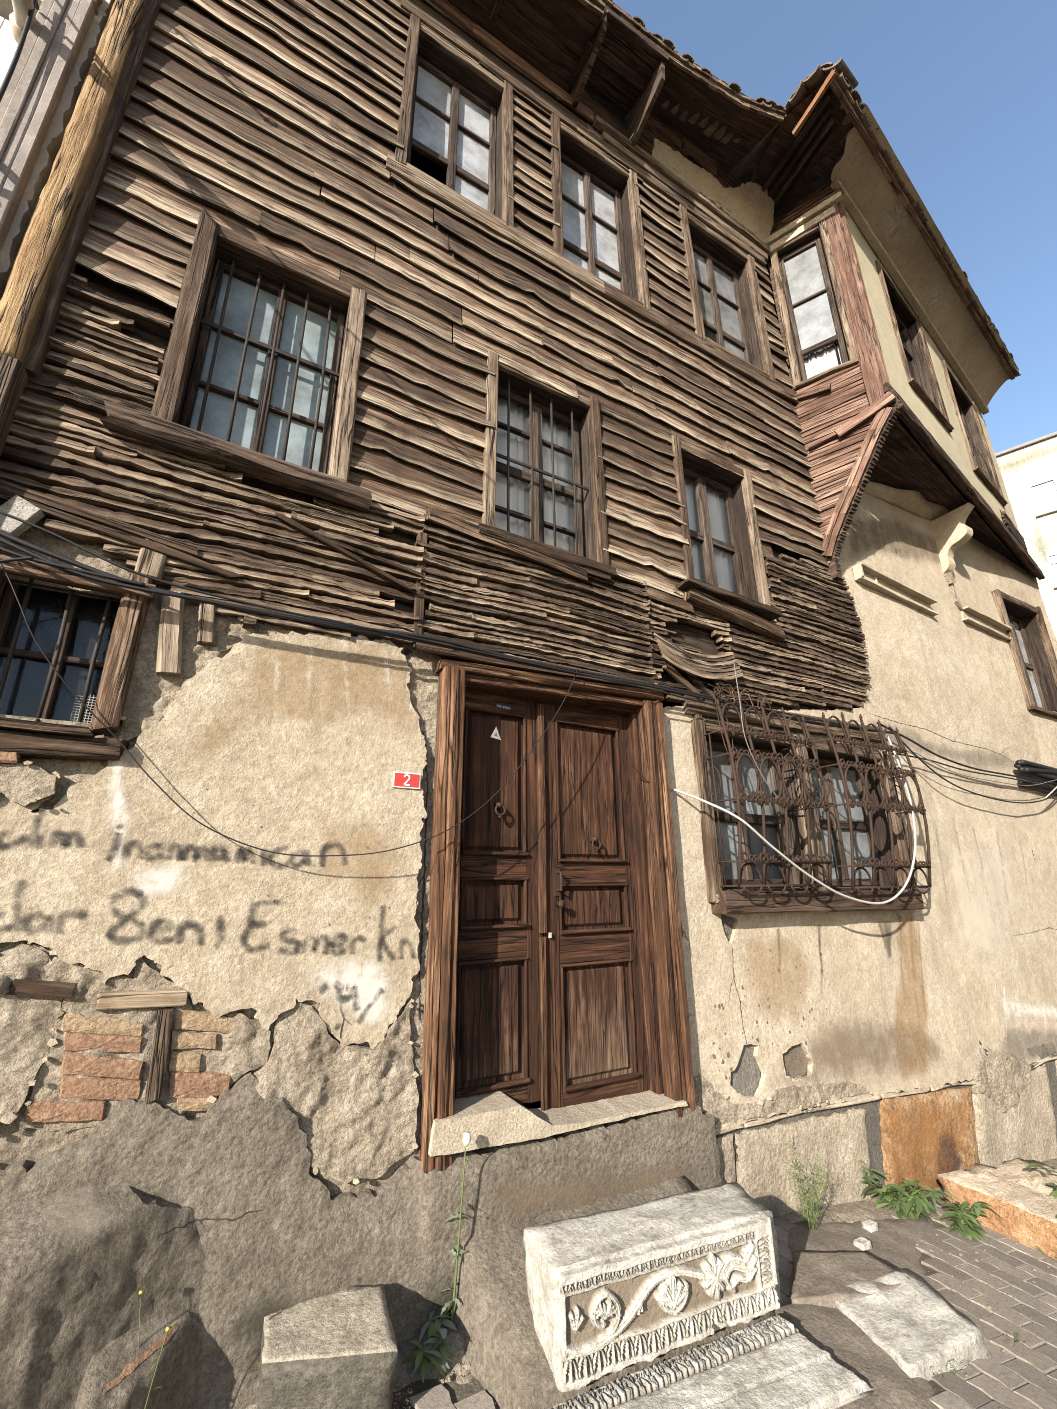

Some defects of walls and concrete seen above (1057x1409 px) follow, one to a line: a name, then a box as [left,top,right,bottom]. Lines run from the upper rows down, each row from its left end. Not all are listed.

flaking render [118,599,256,741]
flaking render [0,752,58,807]
flaking render [0,943,419,1185]
crack [727,933,747,1044]
flaking render [690,949,873,1125]